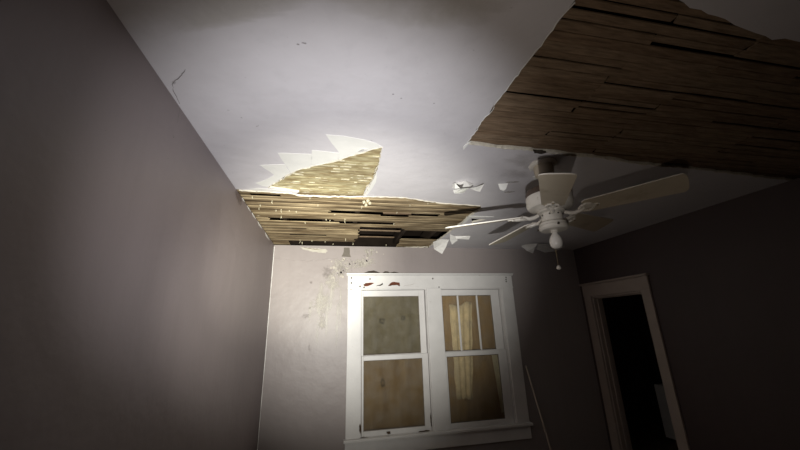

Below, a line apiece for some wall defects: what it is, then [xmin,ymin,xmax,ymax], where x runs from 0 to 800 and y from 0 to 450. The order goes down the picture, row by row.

flaking render [463,2,594,158]
peeling [239,135,484,254]